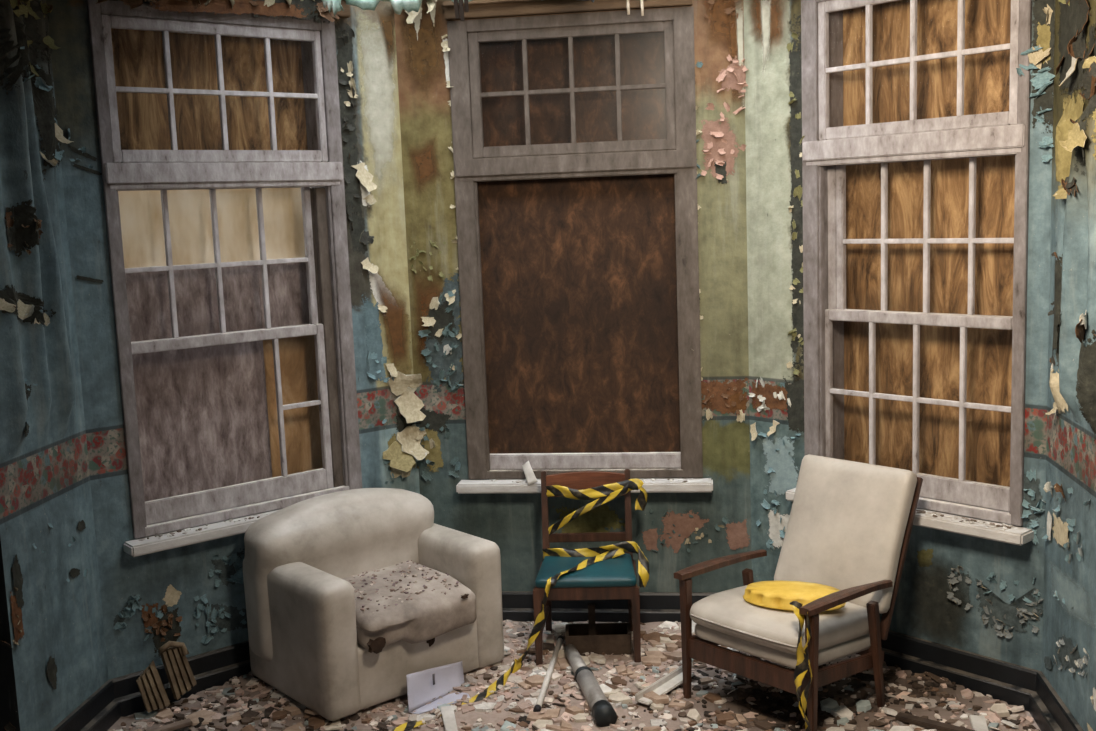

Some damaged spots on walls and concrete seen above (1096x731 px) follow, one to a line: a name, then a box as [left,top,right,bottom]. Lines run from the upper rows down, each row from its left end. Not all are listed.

peeling [696,0,749,189]
peeling [1016,0,1055,162]
peeling [4,199,43,257]
peeling [95,0,464,394]
peeling [0,284,56,326]
peeling [1046,252,1096,441]
peeling [642,432,801,554]
flaking render [113,548,248,658]
peeling [947,566,1074,638]
peeling [1044,634,1090,677]